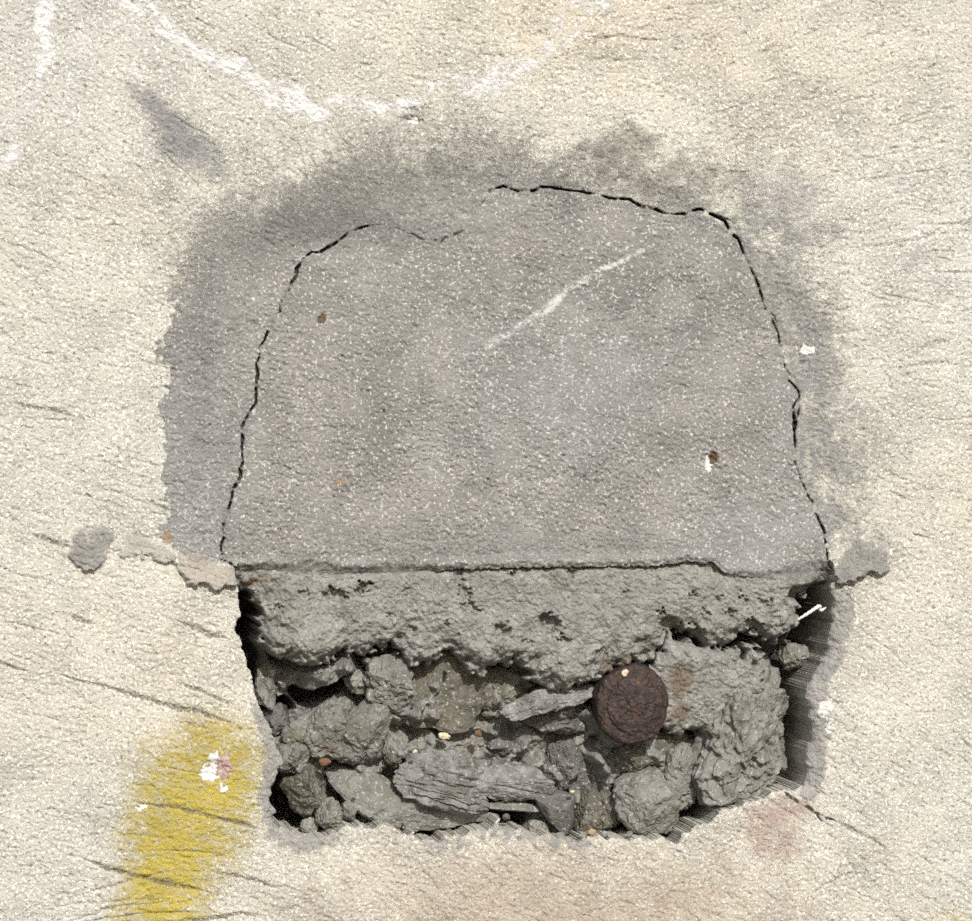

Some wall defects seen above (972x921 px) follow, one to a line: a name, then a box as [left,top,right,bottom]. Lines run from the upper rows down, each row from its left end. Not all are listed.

crack [220,223,463,590]
crack [482,186,833,570]
spalling [269,771,321,827]
spalling [481,798,574,832]
spalling [235,558,829,809]
peeling [818,700,833,733]